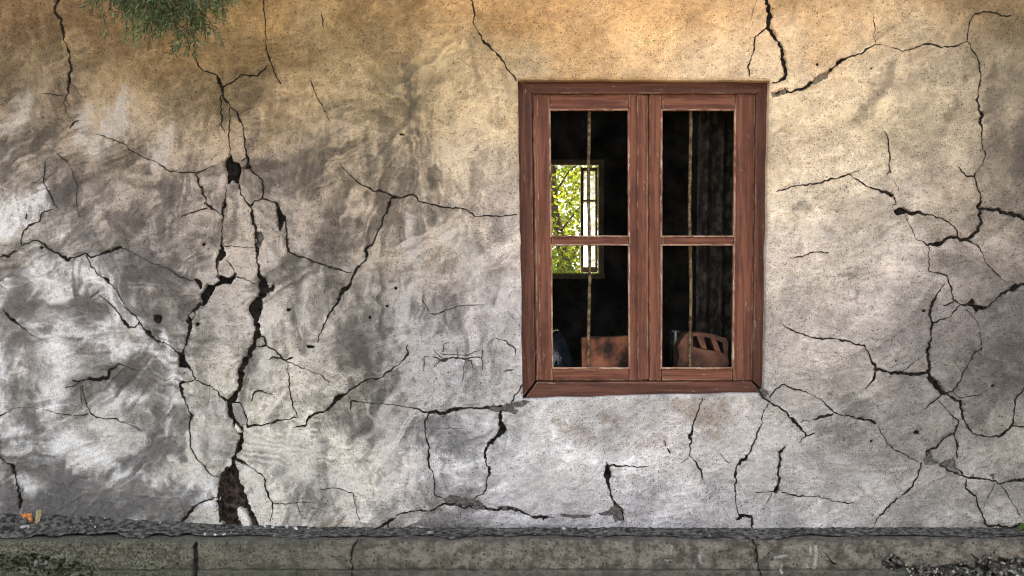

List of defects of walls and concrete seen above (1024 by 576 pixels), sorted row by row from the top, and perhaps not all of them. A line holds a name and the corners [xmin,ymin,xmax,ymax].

crack [0,0,648,576]
crack [664,0,1024,576]